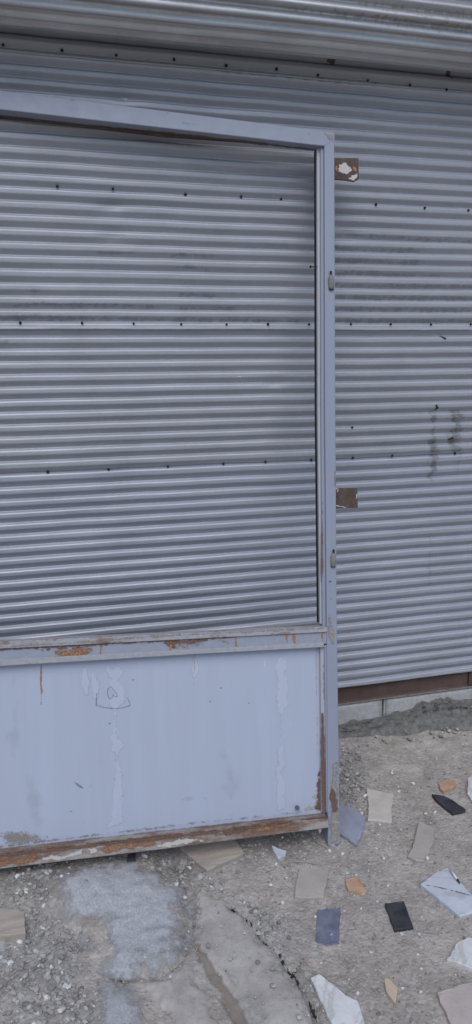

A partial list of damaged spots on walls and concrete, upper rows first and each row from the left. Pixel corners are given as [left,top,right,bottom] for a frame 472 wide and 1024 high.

corrosion [0,637,237,656]
corrosion [305,713,329,820]
corrosion [0,821,292,867]